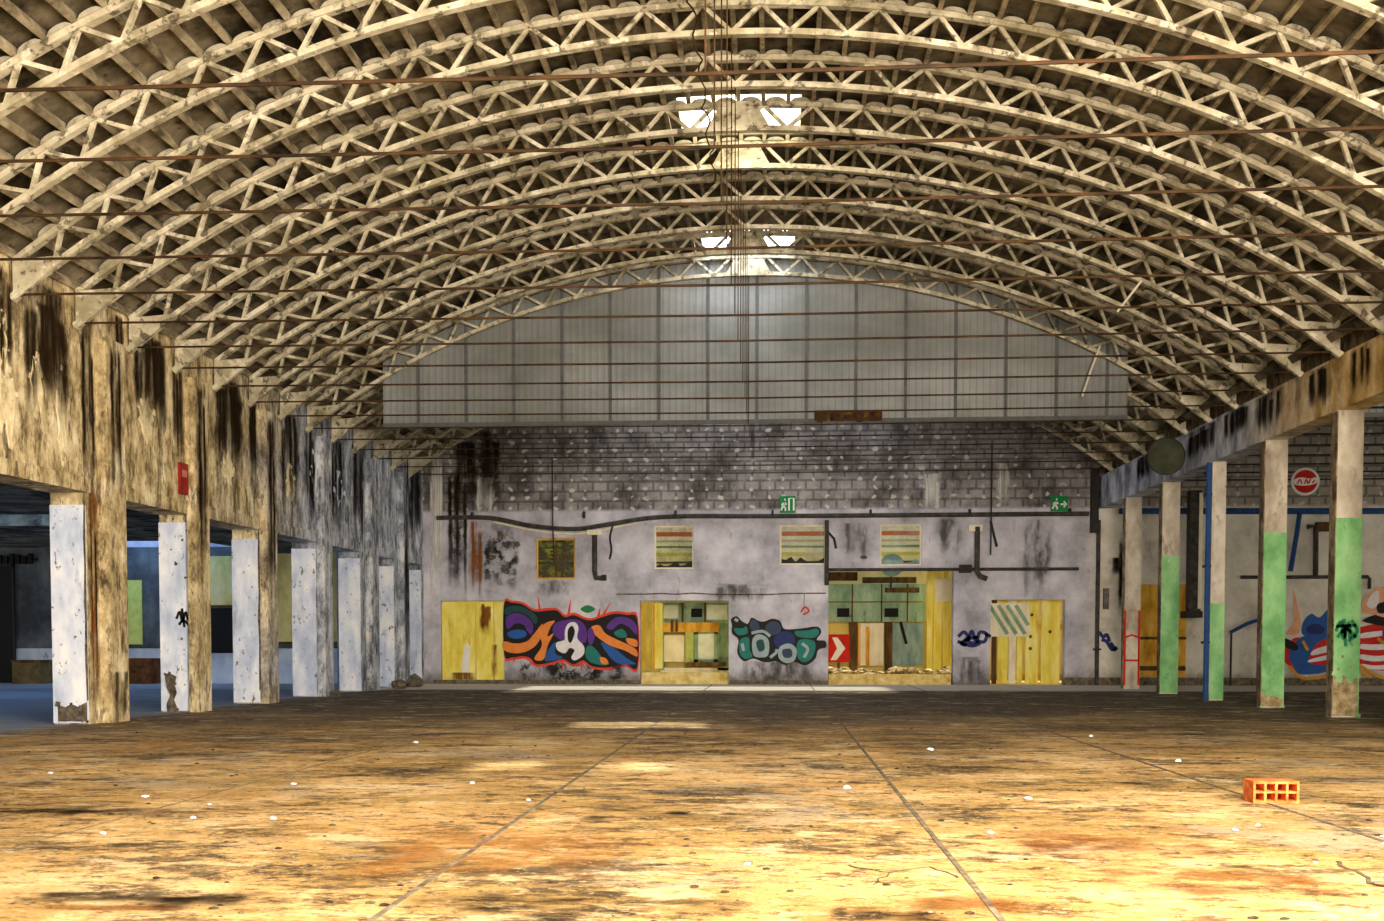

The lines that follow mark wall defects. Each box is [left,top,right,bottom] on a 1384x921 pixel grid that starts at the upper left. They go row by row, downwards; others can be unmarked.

water stain [0,269,95,465]
water stain [1309,366,1330,401]
water stain [1350,346,1369,383]
water stain [110,316,315,564]
water stain [331,440,363,534]
water stain [405,432,500,624]
water stain [484,535,517,578]